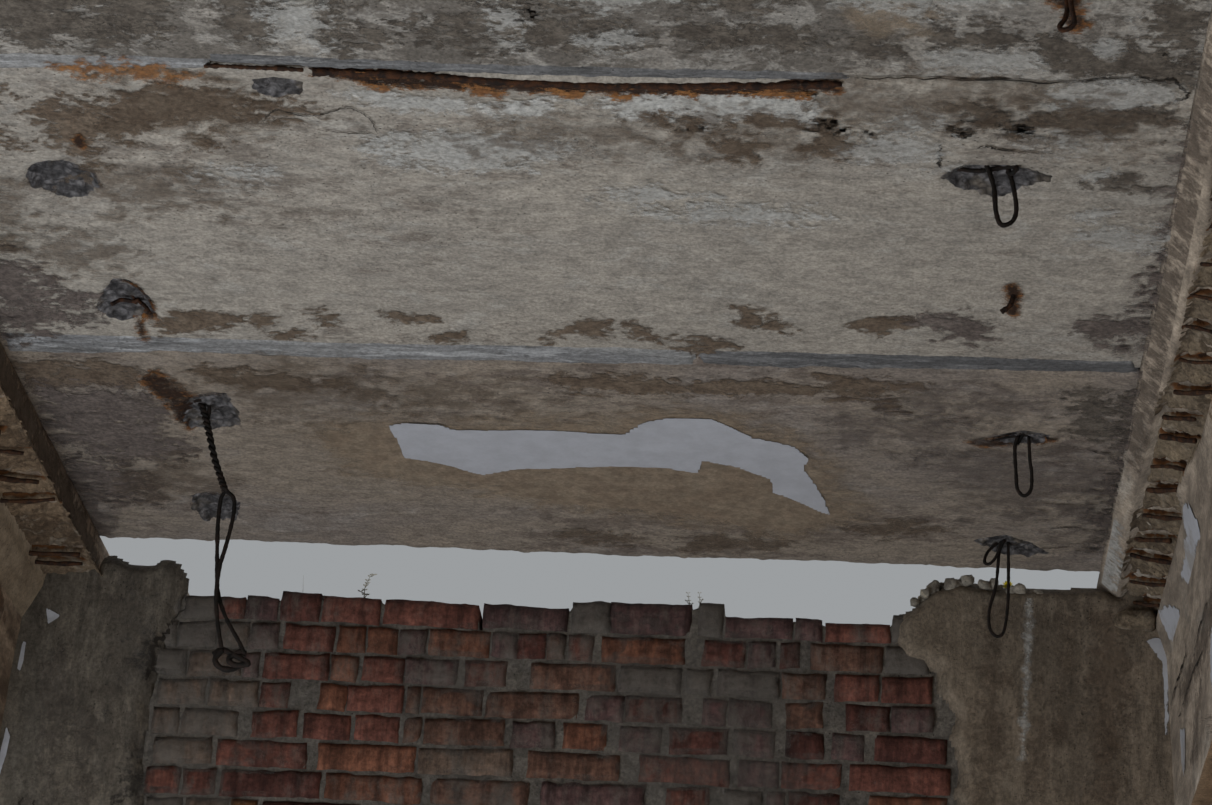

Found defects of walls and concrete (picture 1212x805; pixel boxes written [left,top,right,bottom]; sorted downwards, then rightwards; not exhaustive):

rust [1044,0,1094,34]
rust [44,55,846,102]
spalling [26,159,103,198]
water stain [0,0,1211,358]
spalling [97,279,158,321]
rust [123,280,160,342]
rust [1002,283,1023,318]
water stain [0,245,202,538]
water stain [186,362,355,395]
water stain [536,371,931,417]
spalling [0,381,103,576]
spalling [1113,218,1212,774]